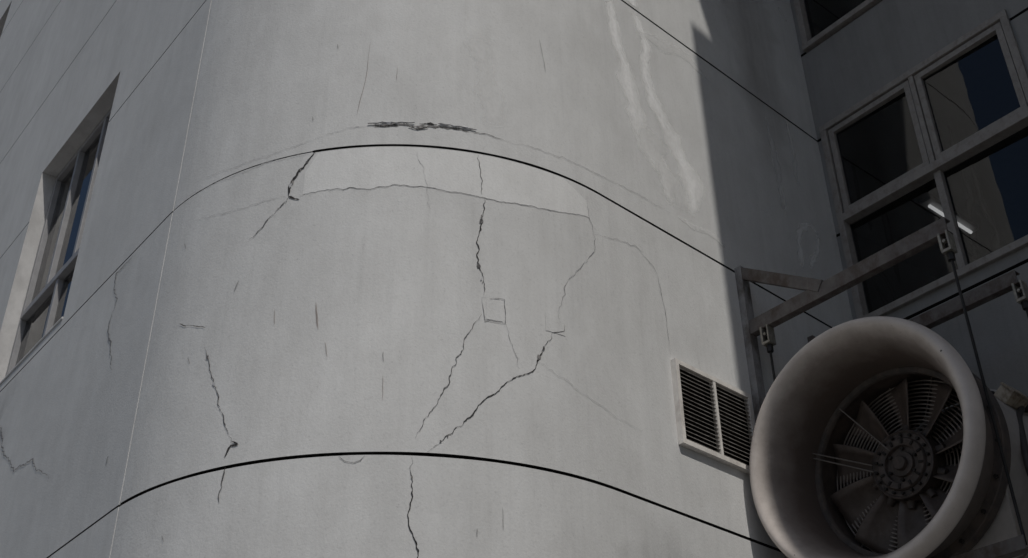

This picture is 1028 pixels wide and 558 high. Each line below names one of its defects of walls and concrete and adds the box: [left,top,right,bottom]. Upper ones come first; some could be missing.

crack [194,151,316,240]
spalling [350,121,500,139]
water stain [607,0,722,245]
crack [0,430,49,479]
crack [206,353,238,501]
crack [407,158,669,558]